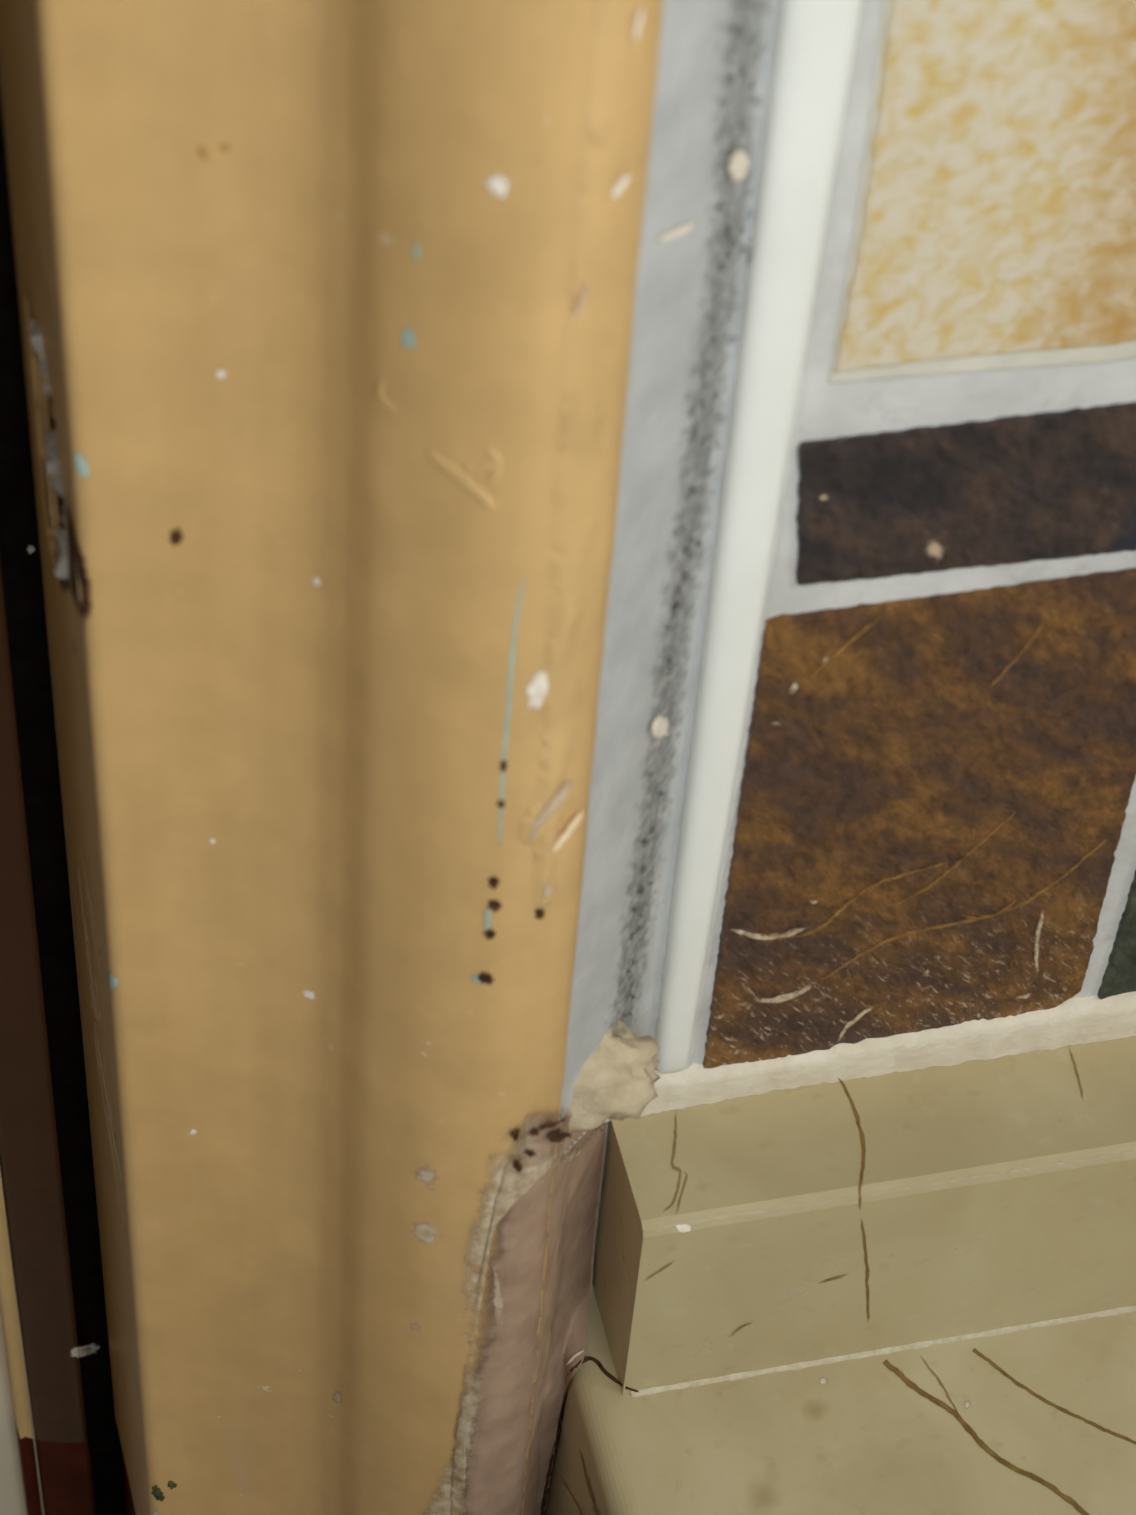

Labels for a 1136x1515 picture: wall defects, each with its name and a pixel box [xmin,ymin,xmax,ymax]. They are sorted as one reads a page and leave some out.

spalling [24,291,92,1105]
spalling [510,1115,572,1173]
crack [826,1080,869,1319]
crack [541,1350,639,1515]
crack [883,1360,1089,1515]
crack [972,1348,1136,1445]